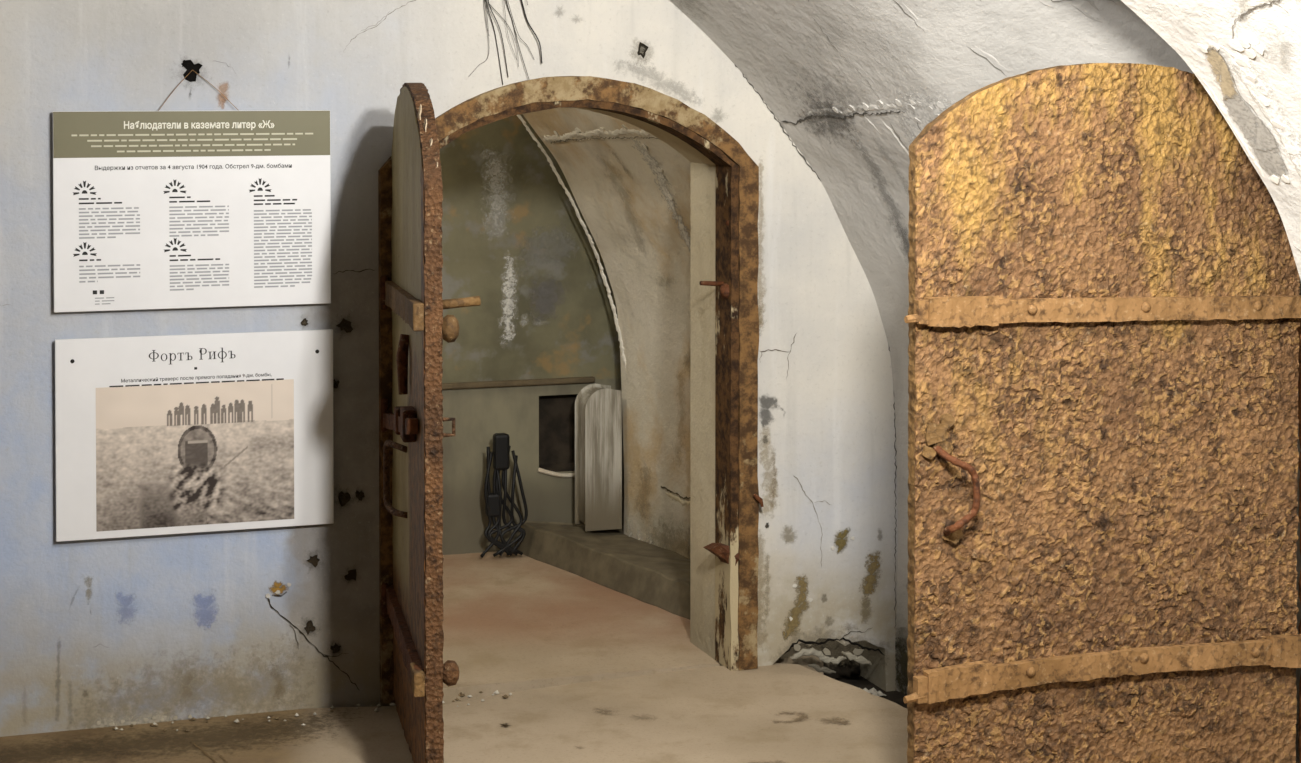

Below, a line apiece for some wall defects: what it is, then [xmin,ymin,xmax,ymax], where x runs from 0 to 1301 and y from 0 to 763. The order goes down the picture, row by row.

crack [345,0,416,49]
crack [968,46,1006,76]
peeling [831,528,854,554]
peeling [862,552,880,597]
crack [268,598,359,690]
spalling [783,576,884,674]
leakage [895,638,908,695]